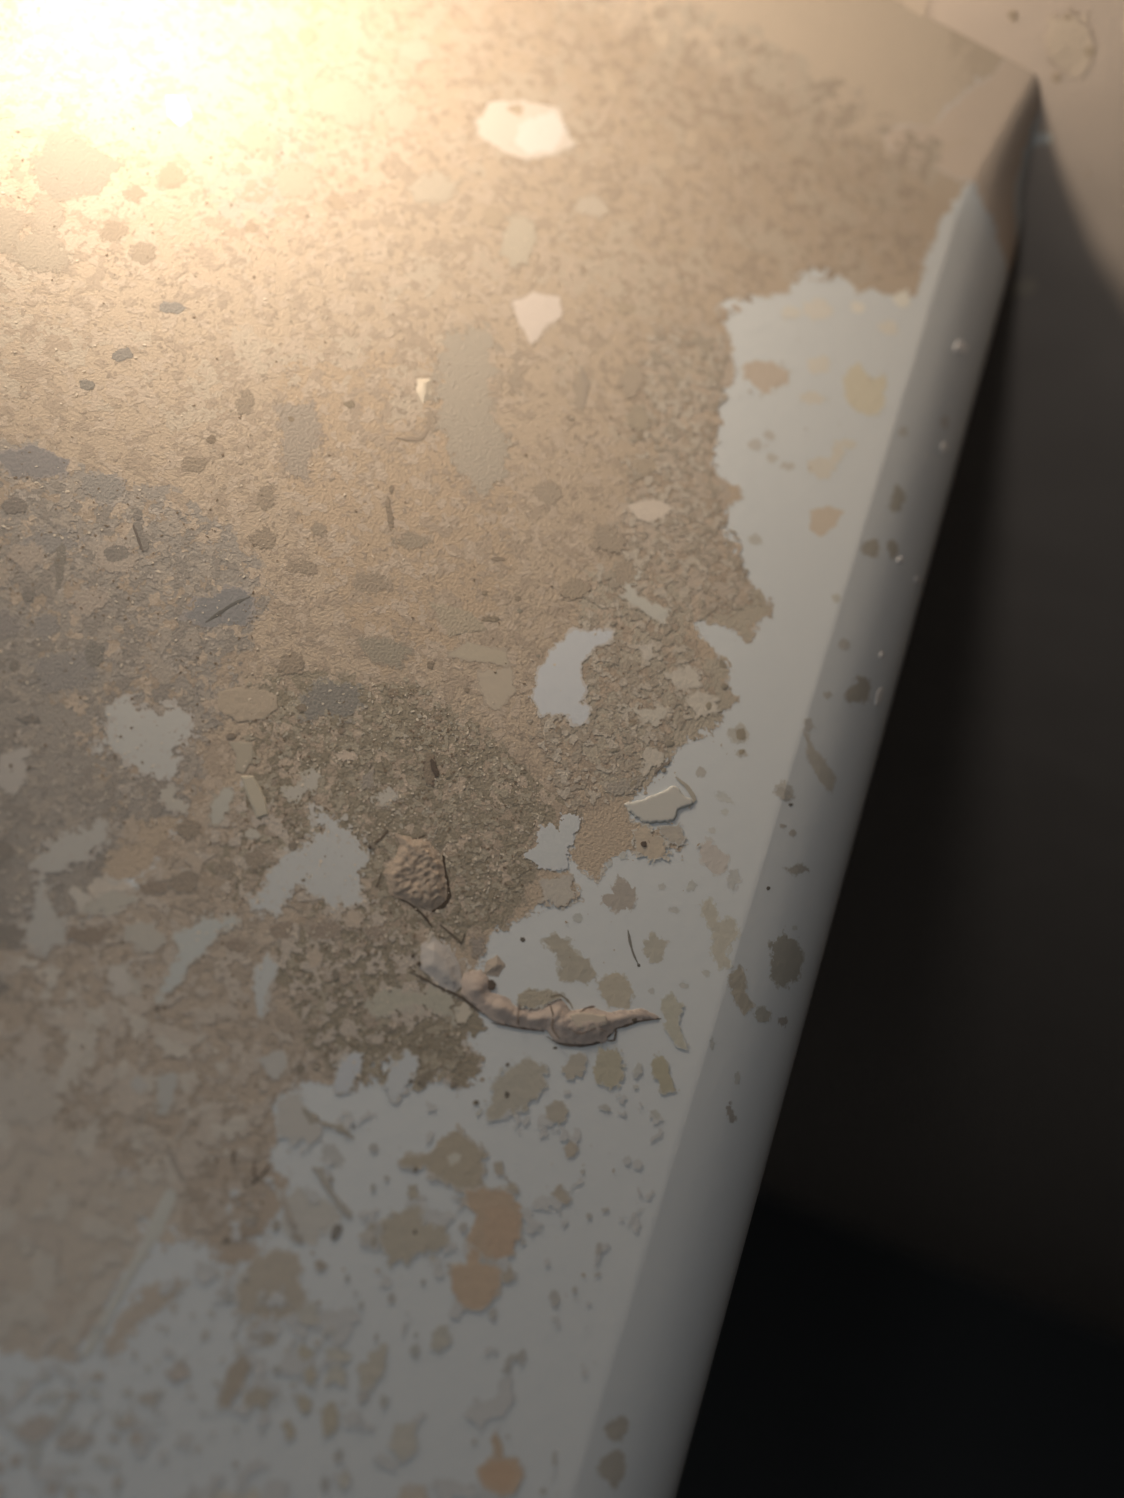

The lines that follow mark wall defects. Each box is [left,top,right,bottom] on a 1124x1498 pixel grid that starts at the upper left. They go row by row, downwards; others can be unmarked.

flaking render [159,301,186,314]
flaking render [111,347,133,362]
flaking render [79,379,95,390]
peeling [416,378,432,403]
flaking render [385,485,394,531]
flaking render [104,508,149,562]
peeling [218,687,277,819]
flaking render [736,728,746,755]